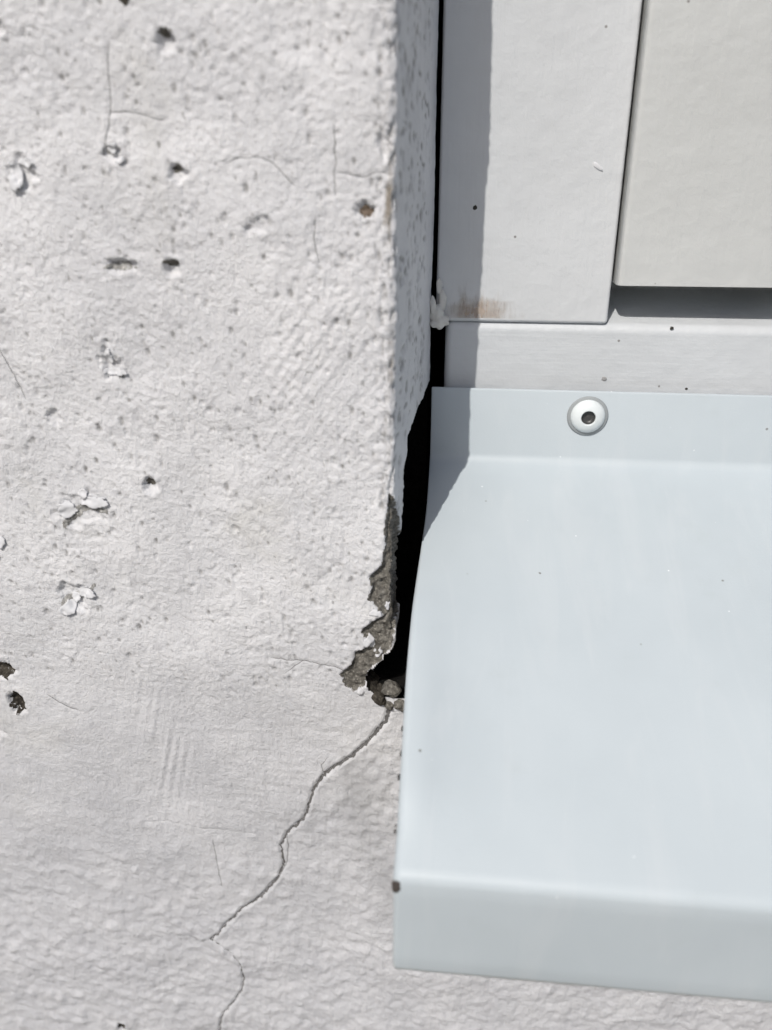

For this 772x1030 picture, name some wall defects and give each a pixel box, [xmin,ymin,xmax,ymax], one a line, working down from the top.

spalling [0,662,26,715]
spalling [339,493,402,693]
crack [181,710,391,1030]